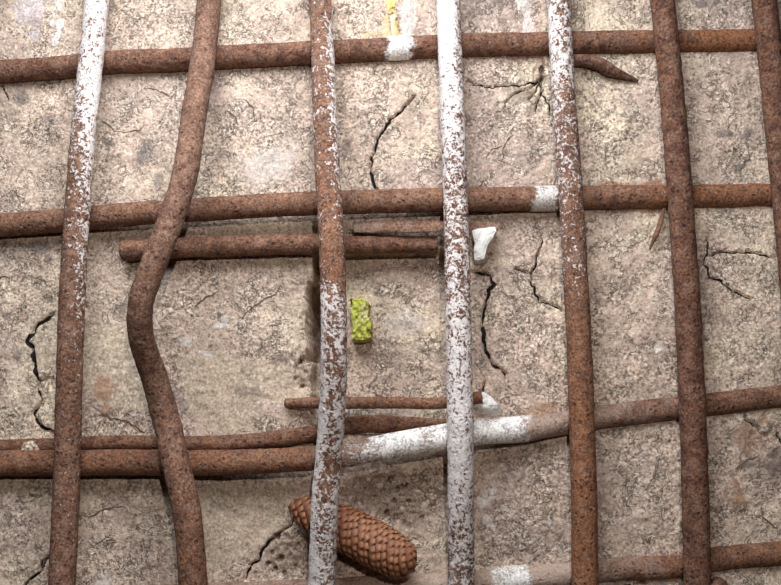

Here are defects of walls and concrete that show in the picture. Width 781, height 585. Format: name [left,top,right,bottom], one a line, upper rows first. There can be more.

crack [370,98,415,190]
crack [469,80,550,112]
crack [25,316,53,431]
spalling [0,0,448,585]
crack [474,272,505,392]
crack [515,238,562,312]
spalling [341,0,781,585]
crack [703,240,769,300]